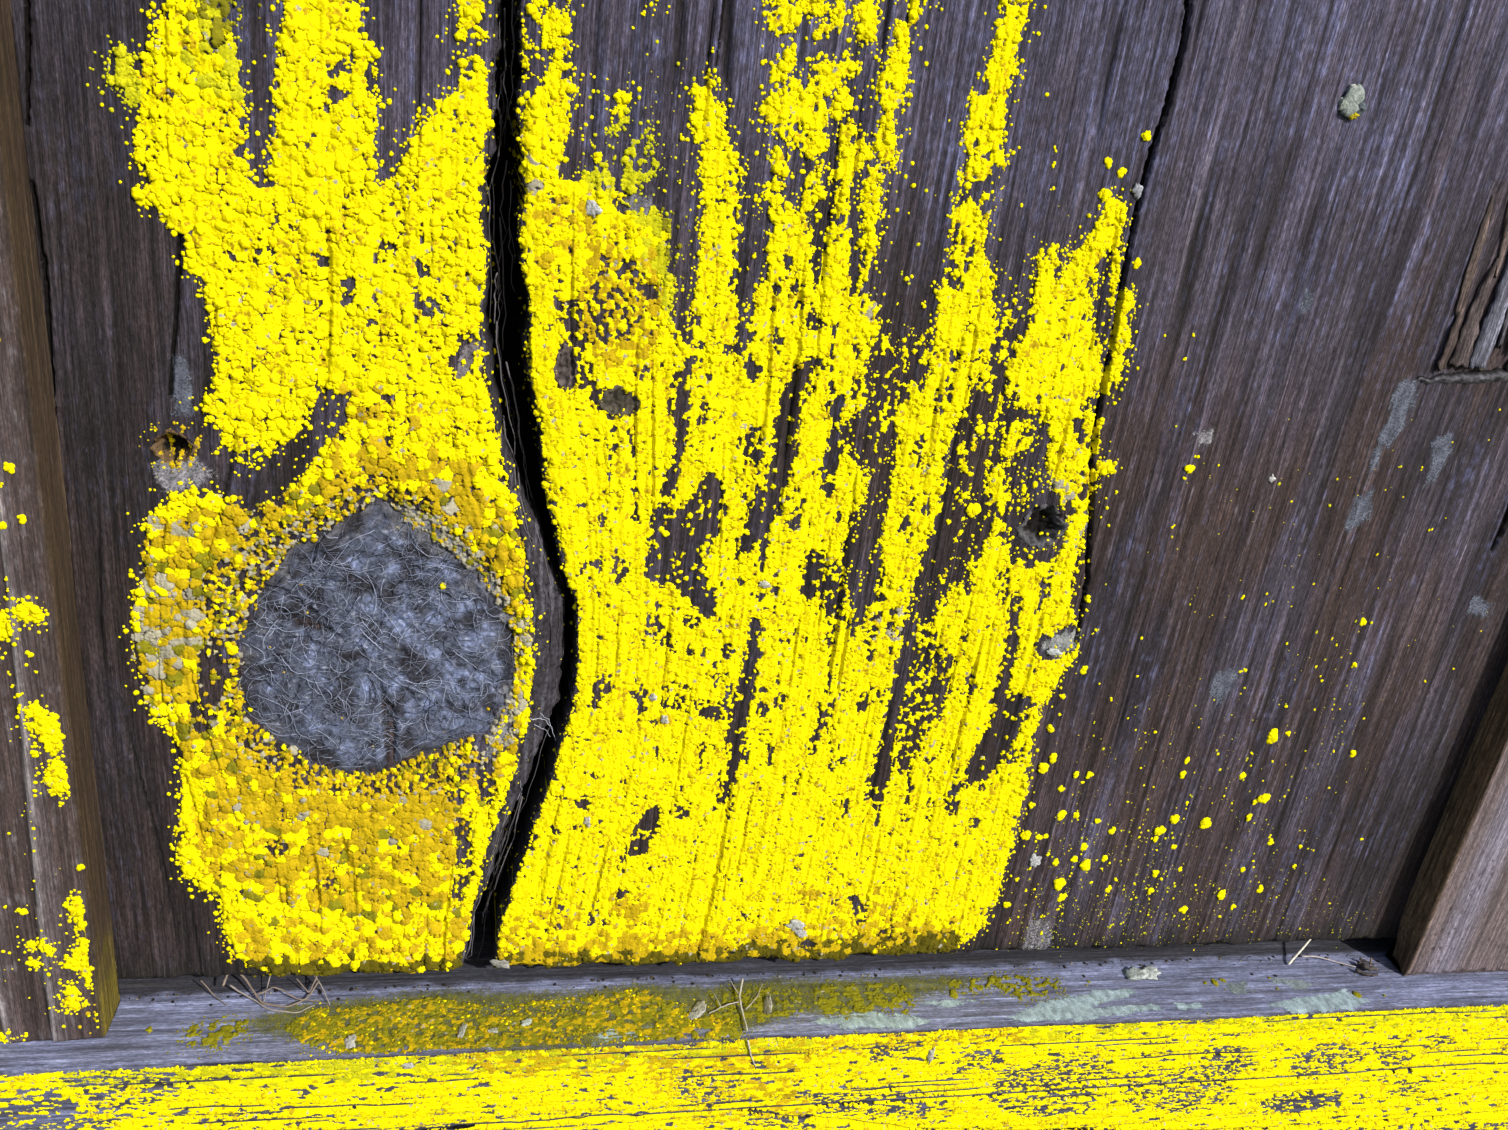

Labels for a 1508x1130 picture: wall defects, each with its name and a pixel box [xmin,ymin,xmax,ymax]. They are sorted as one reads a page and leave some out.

crack [461,0,578,965]
crack [1074,0,1189,641]
crack [1418,367,1508,385]